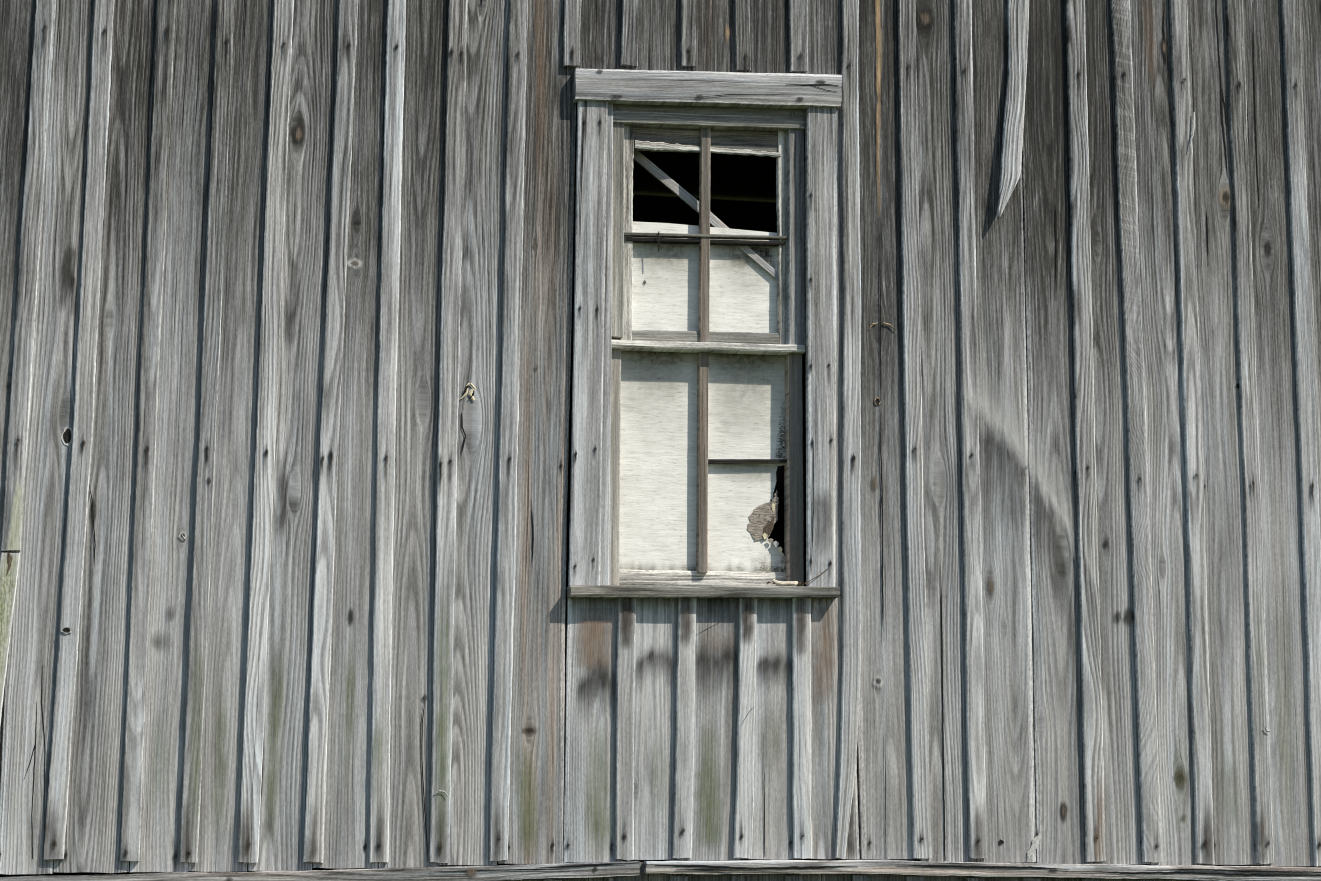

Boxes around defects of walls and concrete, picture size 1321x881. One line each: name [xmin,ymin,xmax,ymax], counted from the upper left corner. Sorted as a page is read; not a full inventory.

leakage [578,669,613,695]
leakage [622,597,632,644]
leakage [638,649,672,671]
leakage [682,598,691,640]
leakage [696,598,754,681]
leakage [759,656,791,675]
leakage [772,598,806,648]